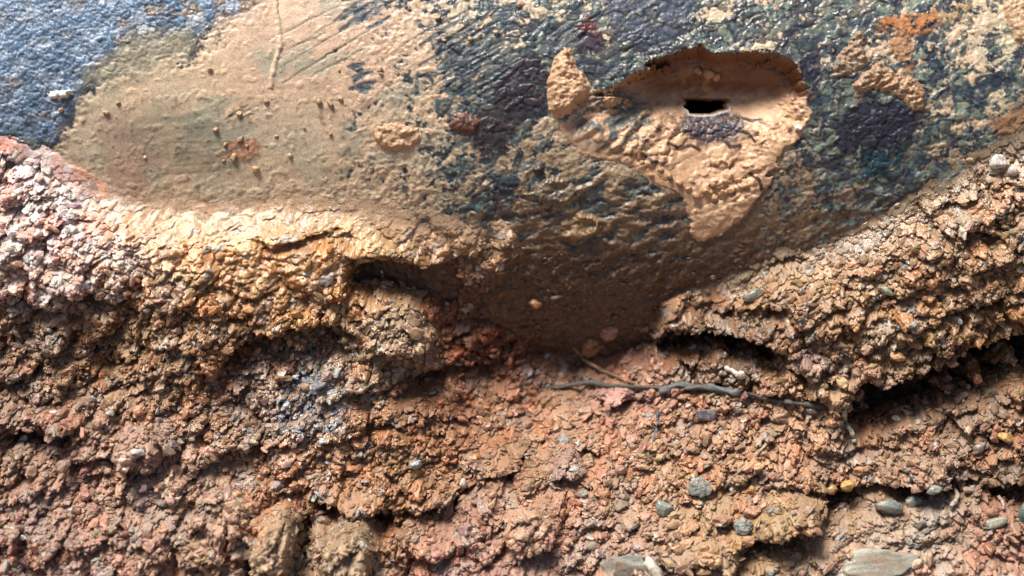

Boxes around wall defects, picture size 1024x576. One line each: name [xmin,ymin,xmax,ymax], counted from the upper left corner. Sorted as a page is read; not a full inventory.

spalling [557,0,822,250]
peeling [834,100,929,180]